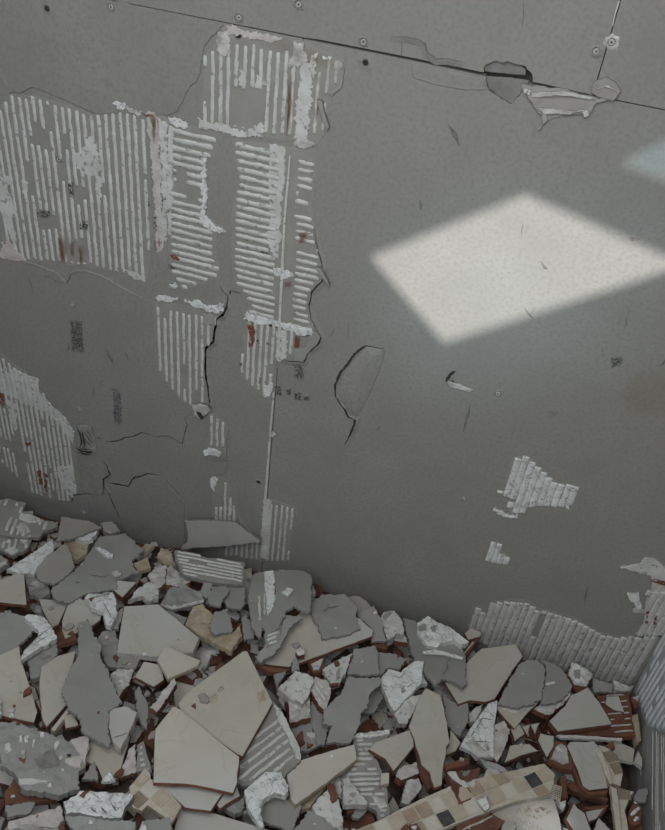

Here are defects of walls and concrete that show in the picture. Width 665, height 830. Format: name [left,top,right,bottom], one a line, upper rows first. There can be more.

peeling [0,0,223,115]
crack [204,285,239,407]
crack [334,345,384,447]
crack [75,415,189,522]
peeling [627,592,645,613]